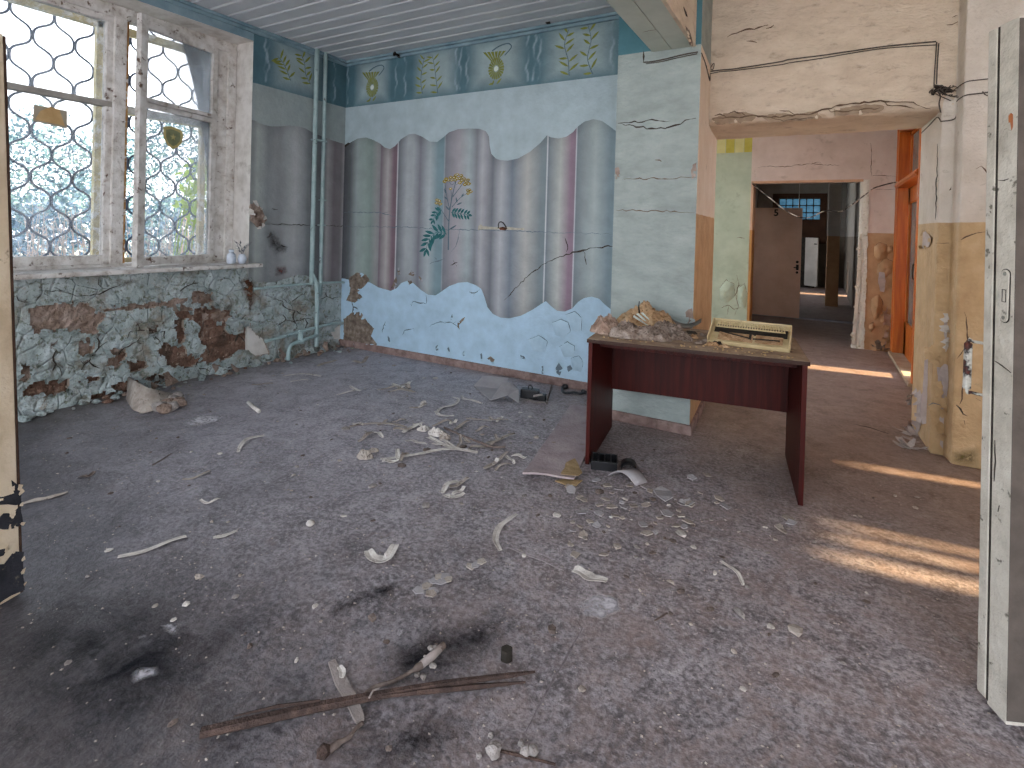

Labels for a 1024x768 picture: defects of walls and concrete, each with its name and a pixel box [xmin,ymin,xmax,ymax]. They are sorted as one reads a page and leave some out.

flaking render [16,273,391,405]